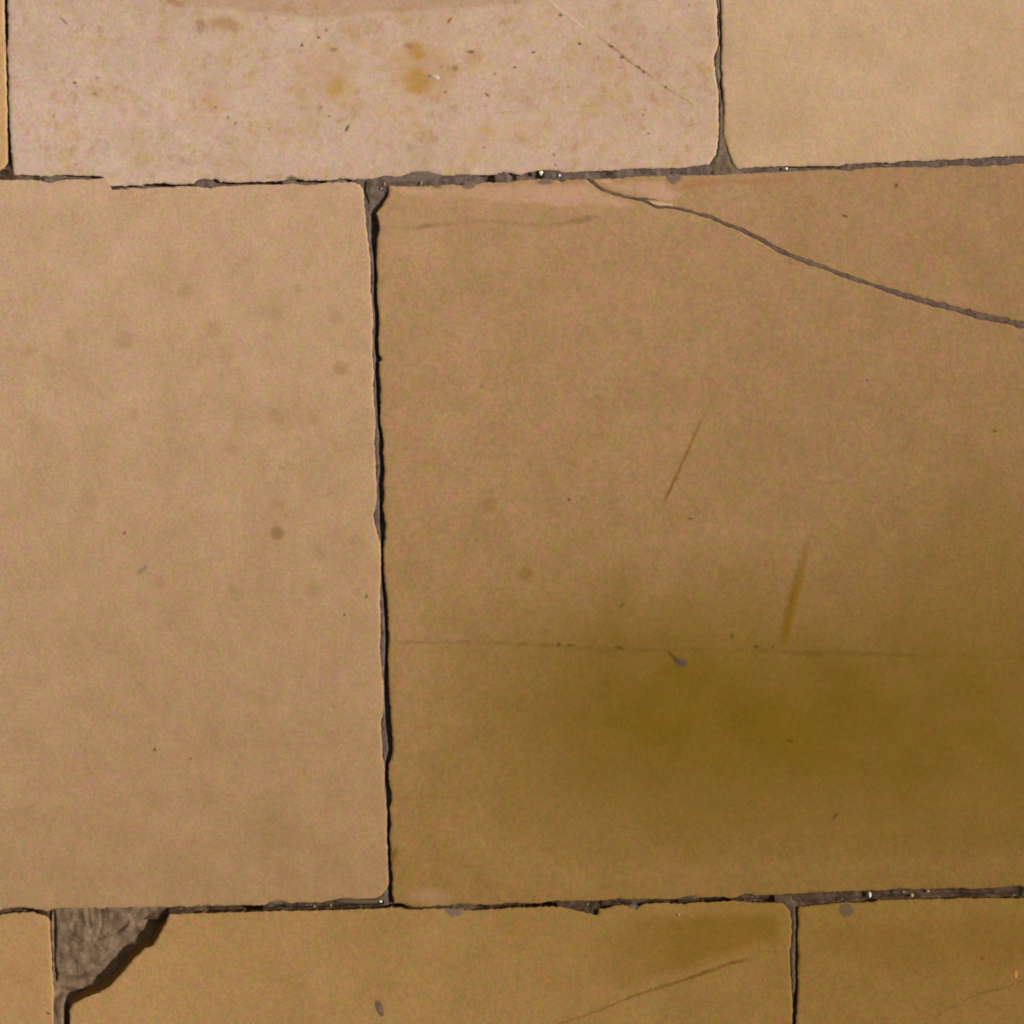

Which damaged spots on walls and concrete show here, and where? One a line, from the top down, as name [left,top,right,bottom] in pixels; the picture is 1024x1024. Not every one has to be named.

crack [588,178,1024,328]
leakage [581,652,1002,783]
spalling [47,906,168,1024]